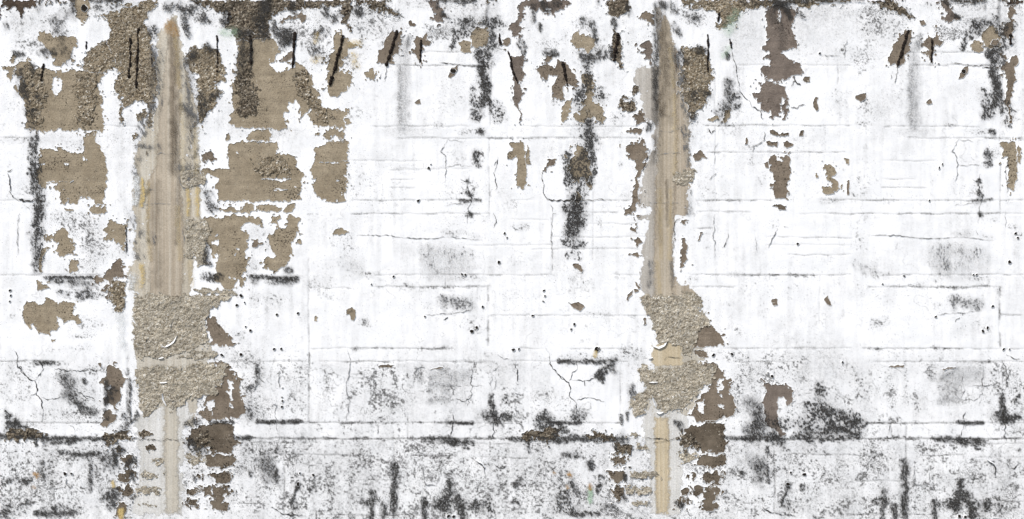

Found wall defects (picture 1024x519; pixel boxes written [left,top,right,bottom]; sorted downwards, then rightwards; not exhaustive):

damp [12,50,97,300]
damp [40,0,76,57]
peeling [0,0,498,519]
damp [560,16,614,260]
peeling [458,0,851,517]
crack [16,353,99,420]
crack [549,353,604,422]
damp [722,382,868,484]